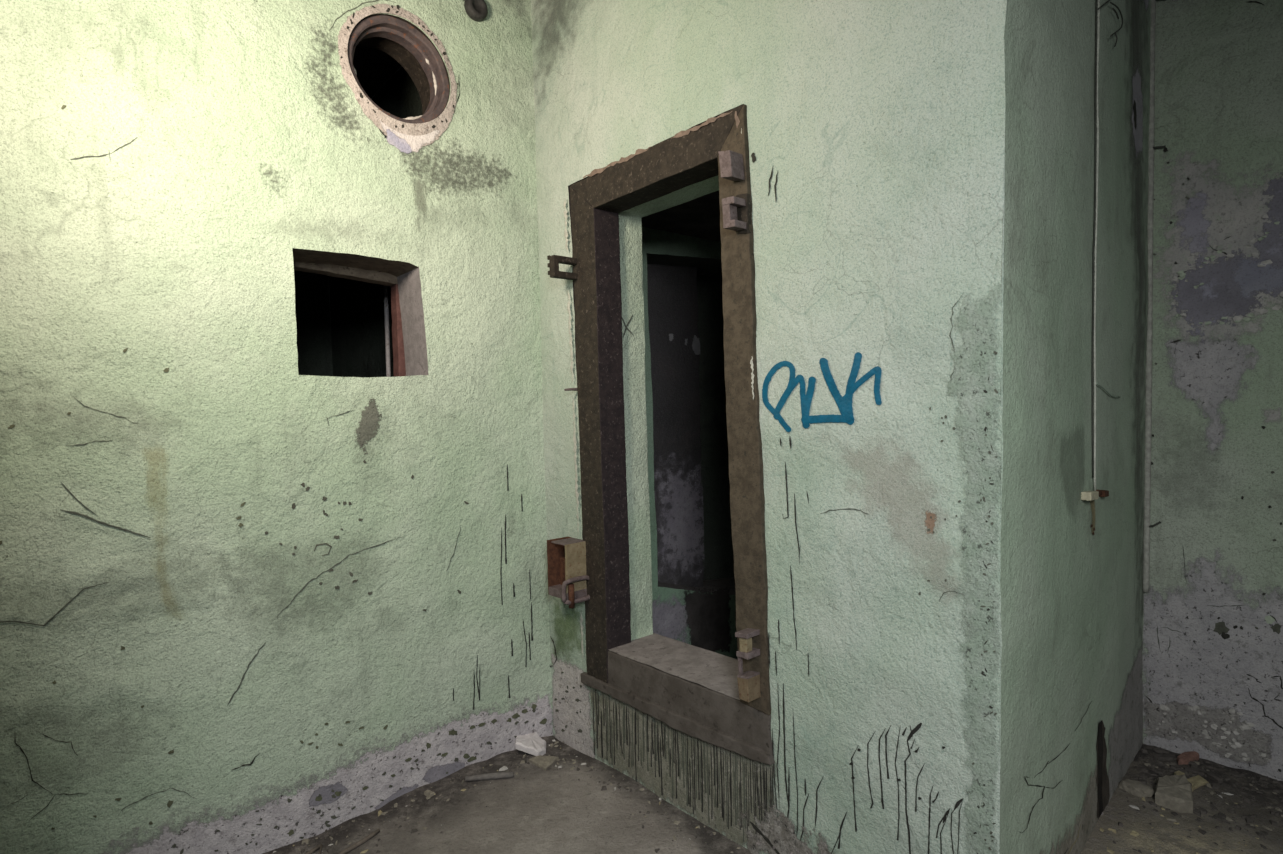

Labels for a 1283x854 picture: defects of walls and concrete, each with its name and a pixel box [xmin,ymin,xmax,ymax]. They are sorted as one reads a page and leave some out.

peeling [1153,152,1283,451]
crack [11,734,83,821]
flaking render [125,615,595,854]
flaking render [737,800,835,854]
spalling [947,287,1001,854]
crack [1020,701,1092,833]
flaking render [1096,551,1283,819]